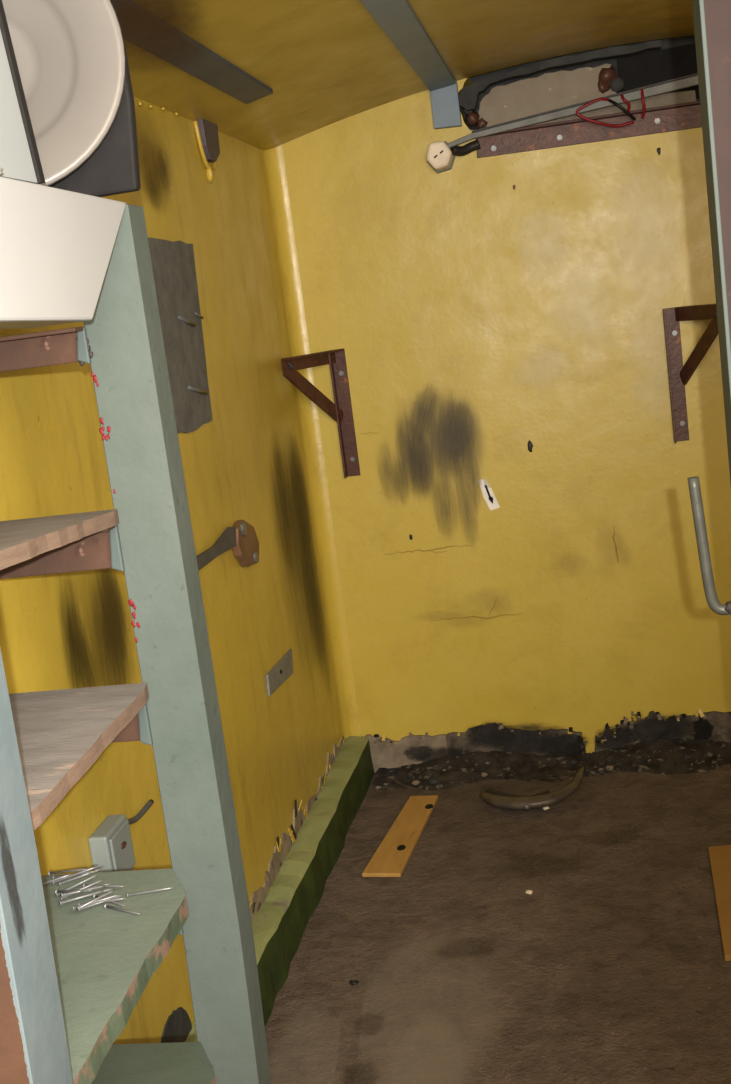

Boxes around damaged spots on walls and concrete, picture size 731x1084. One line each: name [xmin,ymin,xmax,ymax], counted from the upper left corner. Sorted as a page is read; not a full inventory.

leakage [278,472,323,642]
peeling [361,708,731,791]